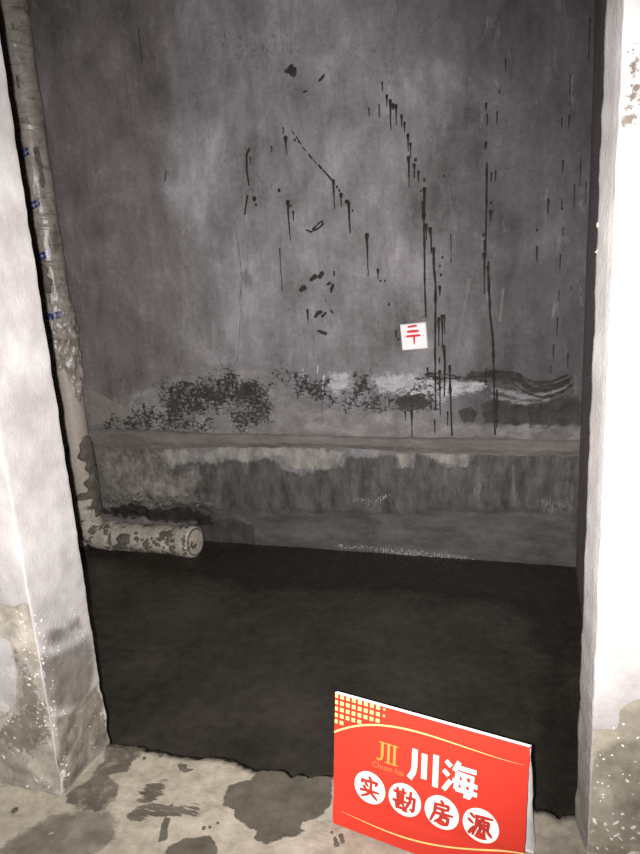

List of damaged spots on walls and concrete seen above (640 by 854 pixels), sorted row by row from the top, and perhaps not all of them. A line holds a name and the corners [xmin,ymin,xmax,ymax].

leakage [102,81,581,440]
leakage [167,454,579,567]
leakage [0,604,146,854]
leakage [127,779,219,854]
leakage [223,771,332,844]
leakage [589,699,640,854]